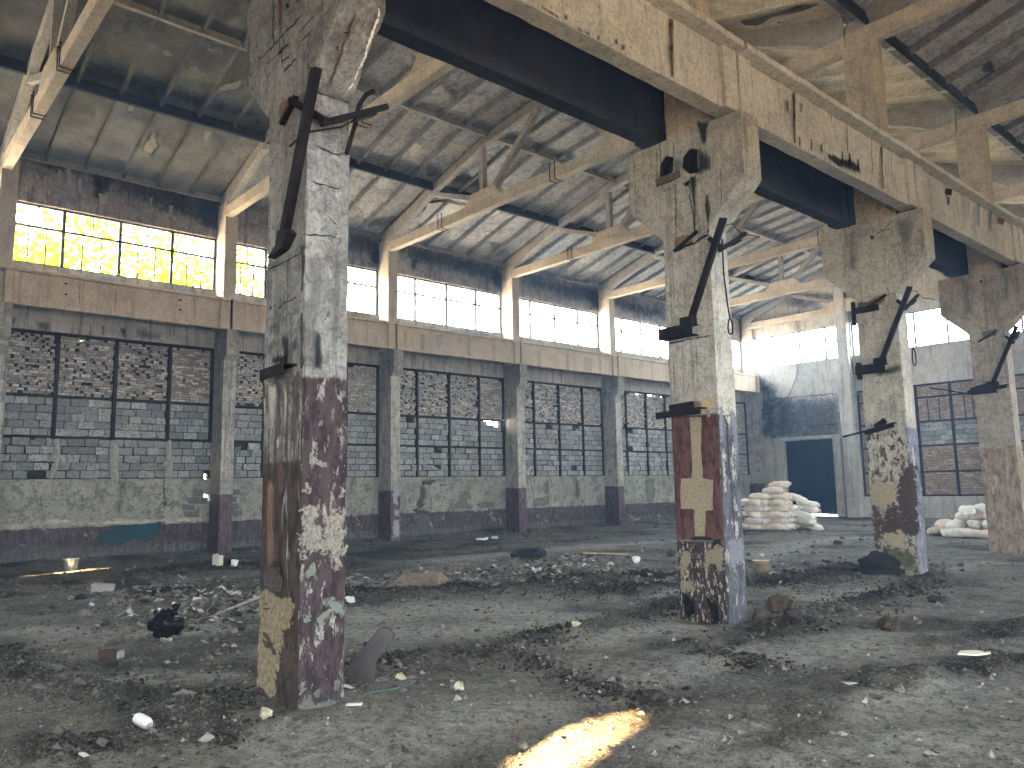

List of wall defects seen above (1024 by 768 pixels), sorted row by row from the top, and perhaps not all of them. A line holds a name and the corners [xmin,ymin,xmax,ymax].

crack [257,4,314,72]
water stain [491,271,502,288]
peeling [295,482,349,580]
peeling [679,396,746,622]
peeling [871,463,924,551]
peeling [256,566,347,701]
peeling [297,676,343,710]